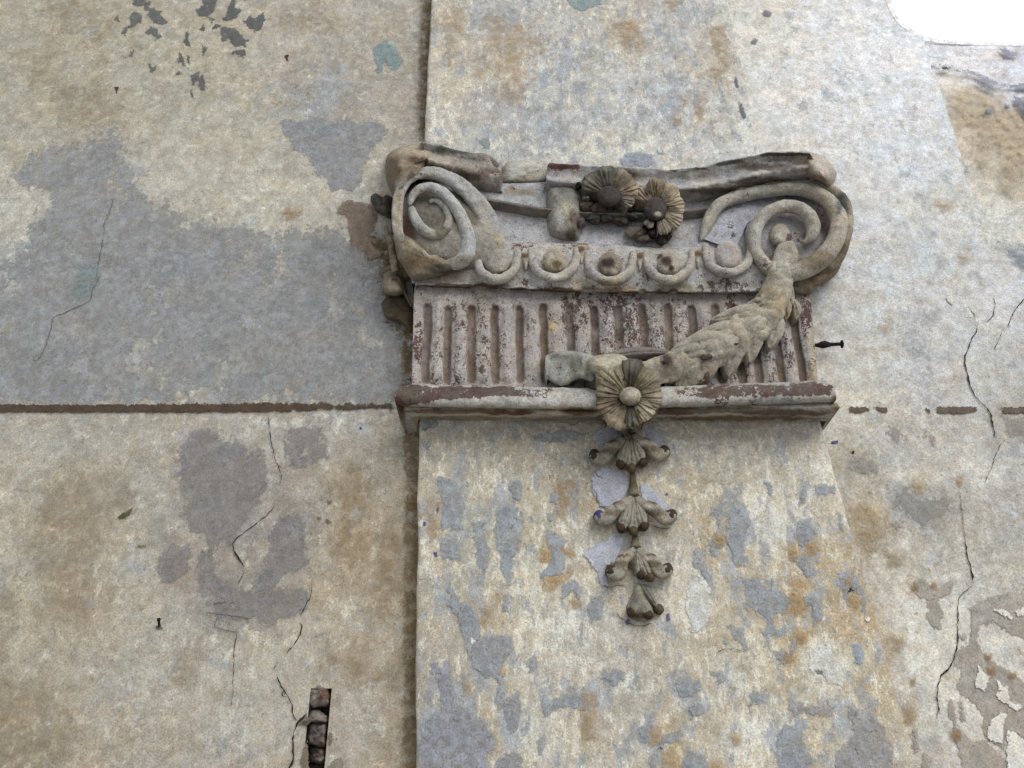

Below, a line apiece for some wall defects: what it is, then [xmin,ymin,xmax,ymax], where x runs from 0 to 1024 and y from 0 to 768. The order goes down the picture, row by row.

peeling [114,0,168,40]
peeling [176,0,265,98]
damp [369,236,408,299]
damp [386,320,413,384]
crack [964,299,1024,482]
crack [232,422,282,583]
peeling [540,493,625,622]
peeling [591,467,673,510]
crack [936,491,974,714]
crack [274,587,312,768]
spalling [298,685,343,768]
peeling [946,591,1024,768]